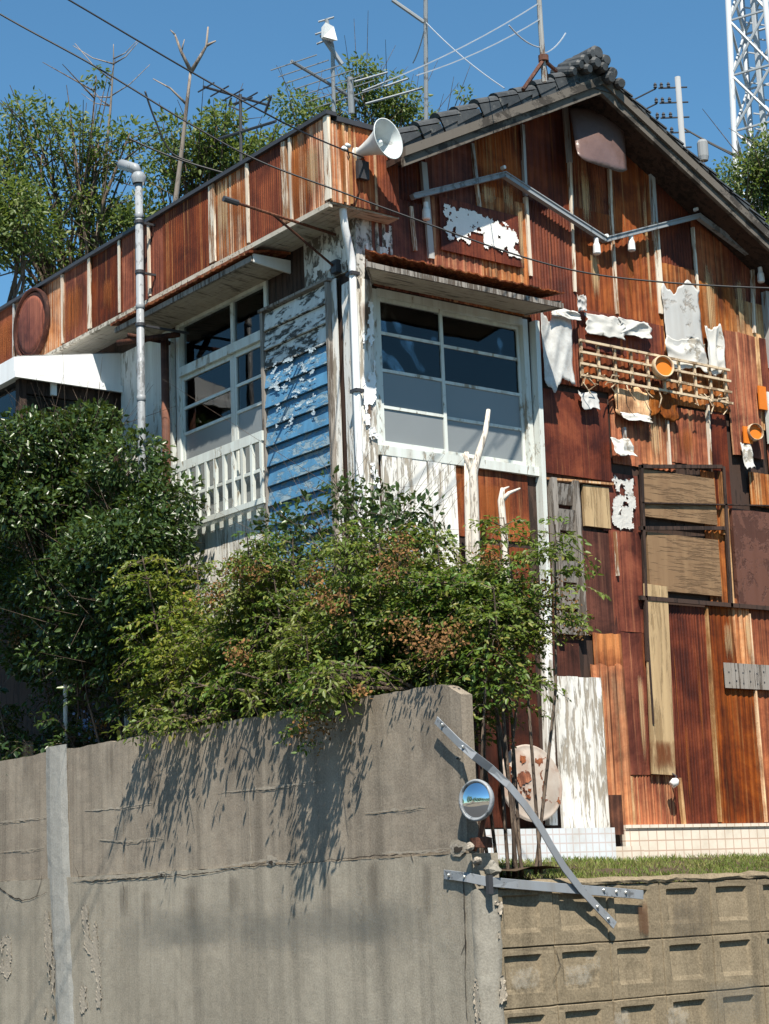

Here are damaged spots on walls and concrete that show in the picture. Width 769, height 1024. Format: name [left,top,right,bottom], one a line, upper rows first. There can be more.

corrosion [291,147,317,202]
peeling [312,240,348,280]
peeling [364,232,392,254]
peeling [443,203,522,259]
corrosion [629,208,651,296]
corrosion [706,271,714,325]
peeling [268,336,317,429]
peeling [612,476,636,530]
corrosion [509,755,561,805]
crack [0,876,46,906]
crack [74,851,444,900]